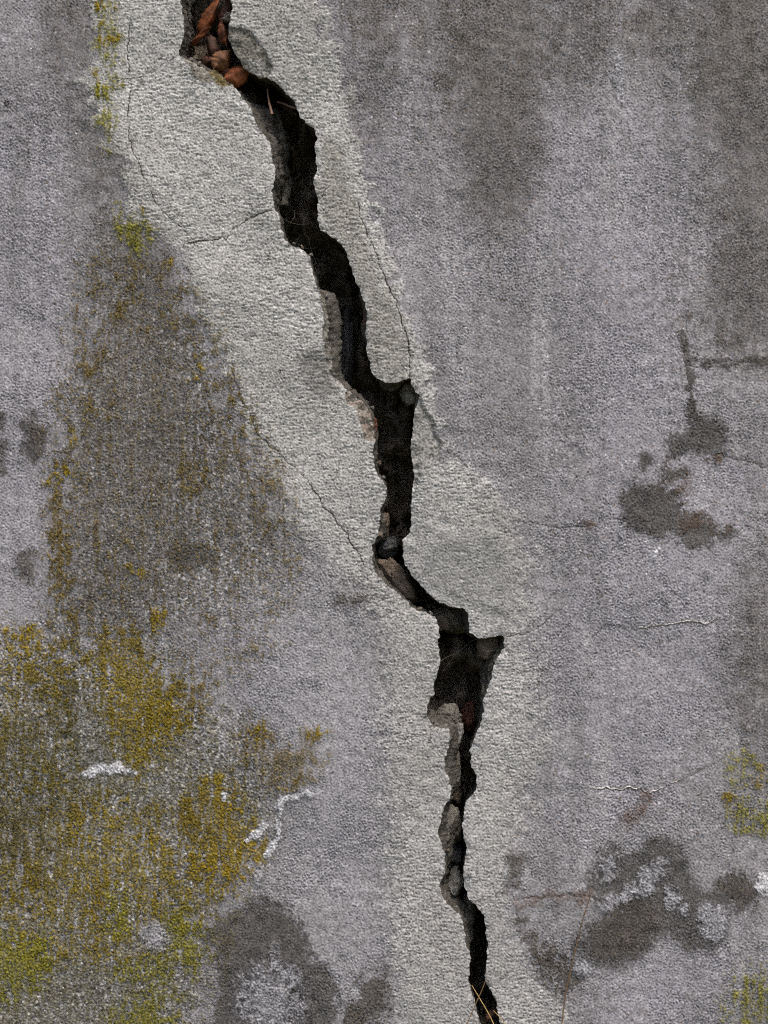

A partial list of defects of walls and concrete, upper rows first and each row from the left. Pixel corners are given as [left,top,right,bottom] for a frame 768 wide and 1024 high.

leakage [20,410,47,471]
leakage [617,330,768,559]
crack [118,0,562,1024]
leakage [16,548,38,585]
leakage [166,534,218,573]
leakage [81,760,138,779]
leakage [503,854,526,893]
leakage [138,920,170,953]
leakage [201,790,392,1024]
leakage [515,835,768,999]